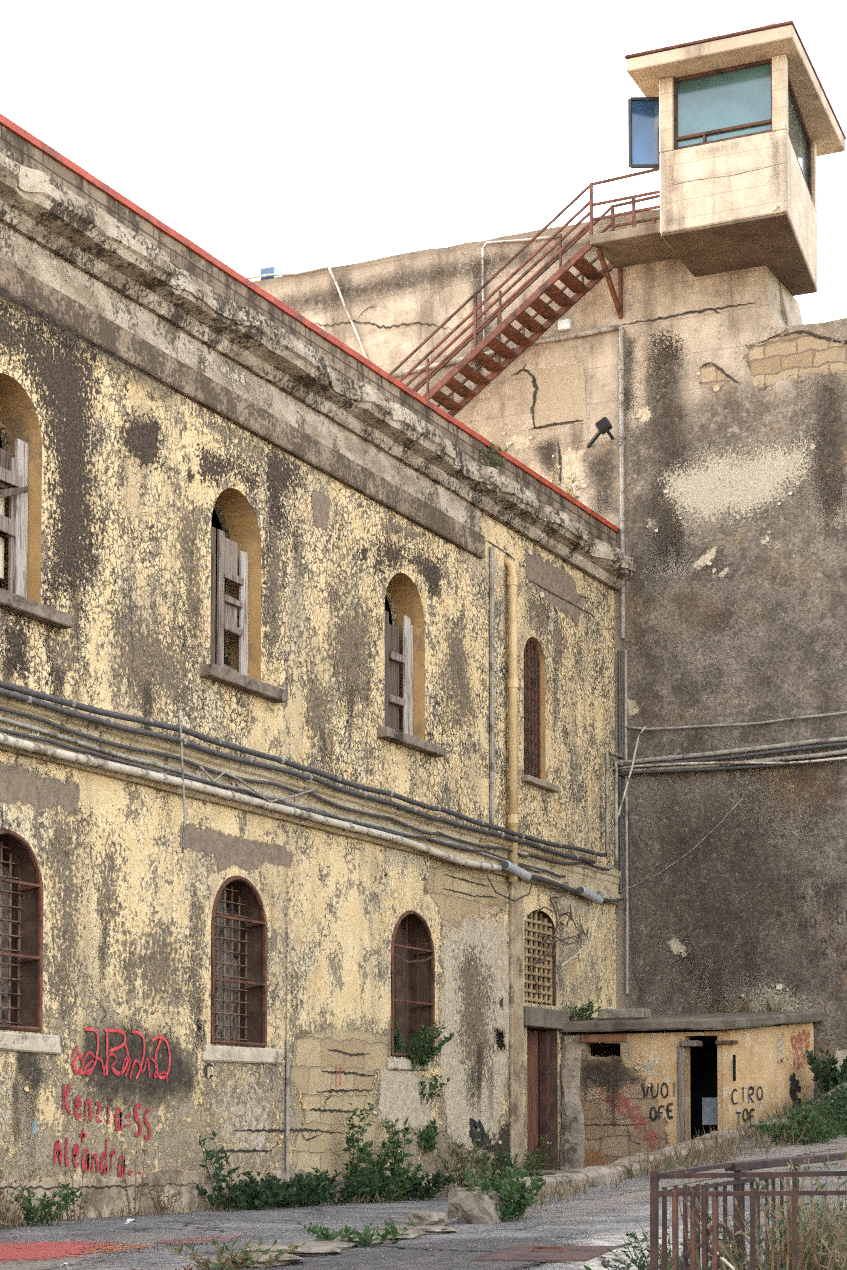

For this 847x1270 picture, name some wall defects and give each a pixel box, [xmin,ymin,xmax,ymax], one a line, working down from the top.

peeling [178,328,259,391]
crack [314,305,446,329]
spalling [742,328,847,392]
crack [759,330,847,343]
crack [511,364,583,484]
damp [0,286,331,730]
spalling [693,546,729,577]
spalling [201,845,510,1178]
damp [451,934,500,1112]
spalling [559,1036,670,1170]
damp [492,1118,510,1170]